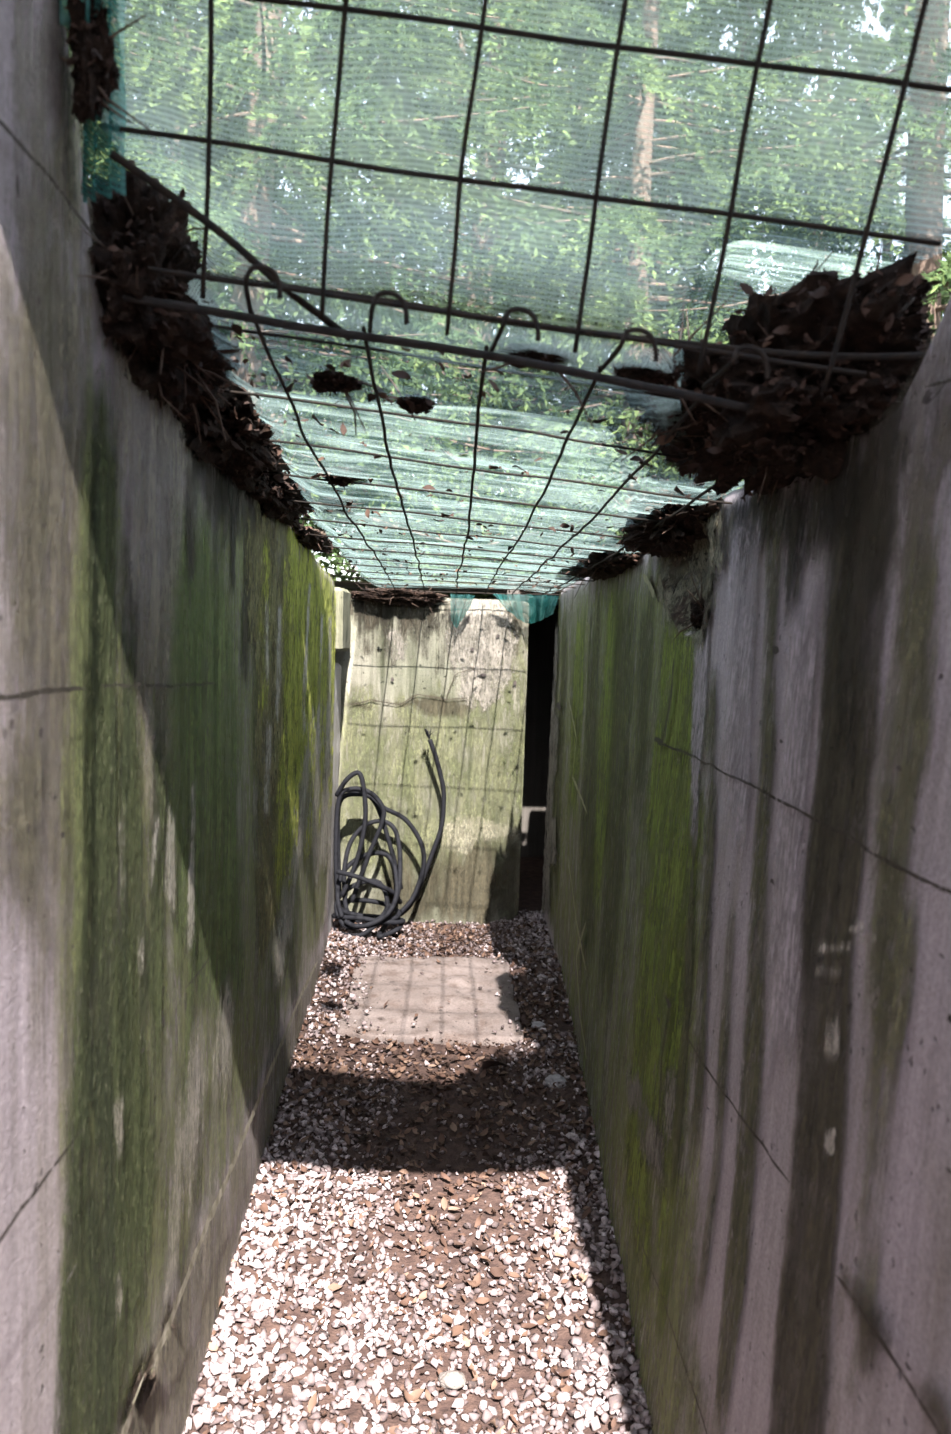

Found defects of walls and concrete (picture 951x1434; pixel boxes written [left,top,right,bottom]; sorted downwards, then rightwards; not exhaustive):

crack [0,682,216,700]
leakage [183,451,254,1146]
leakage [357,603,528,924]
leakage [552,585,622,955]
leakage [624,491,803,1433]
crack [654,659,951,894]
leakage [769,325,951,1434]
crack [0,1128,84,1243]
leakage [121,940,327,1434]